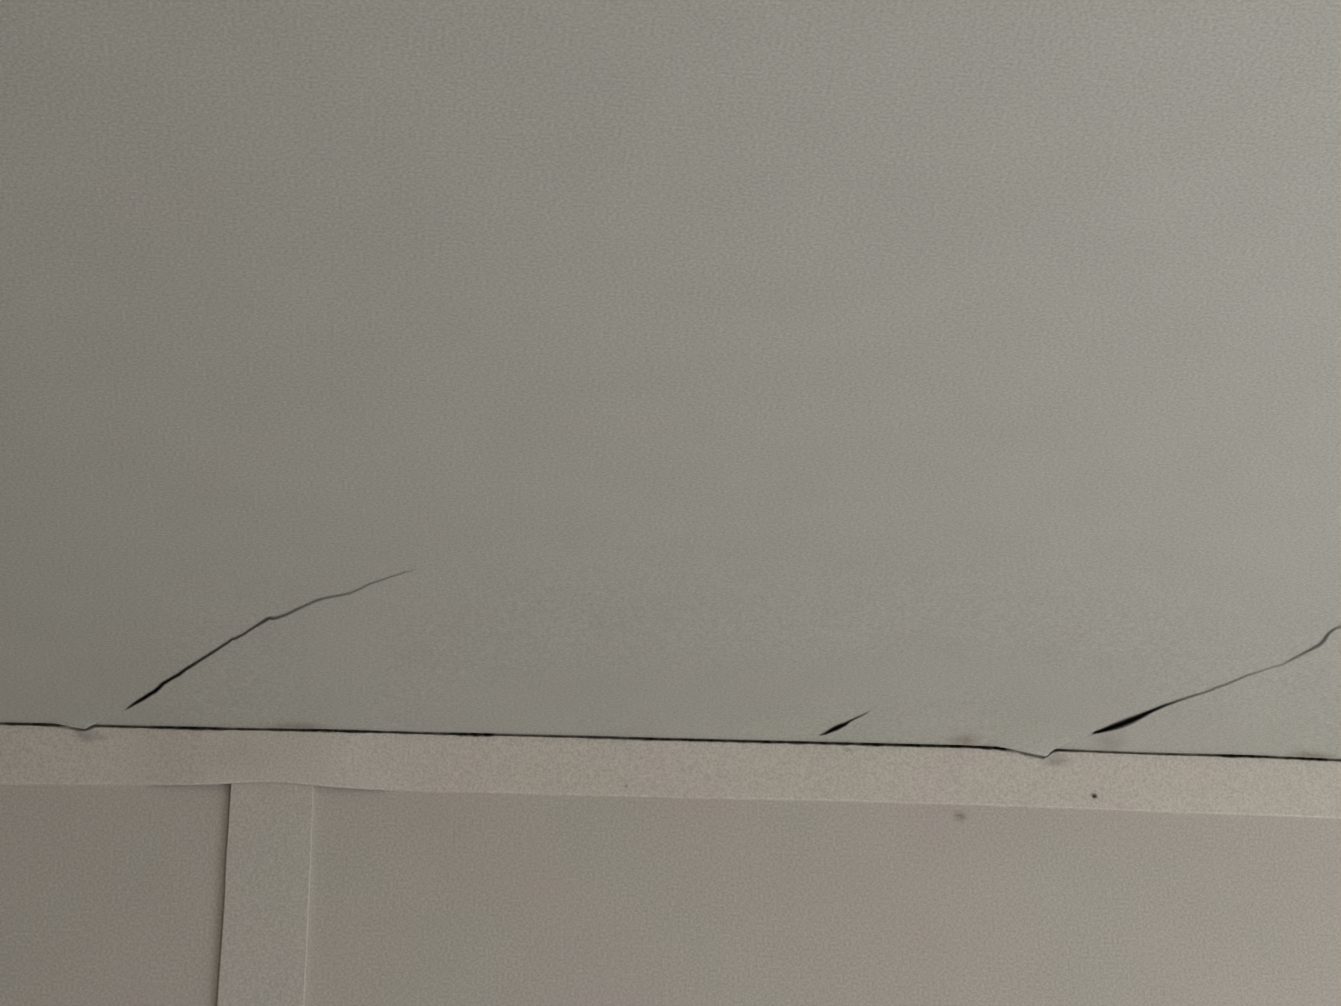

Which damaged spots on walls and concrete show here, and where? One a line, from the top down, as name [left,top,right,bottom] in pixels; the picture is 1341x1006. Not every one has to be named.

crack [5,613,1341,761]